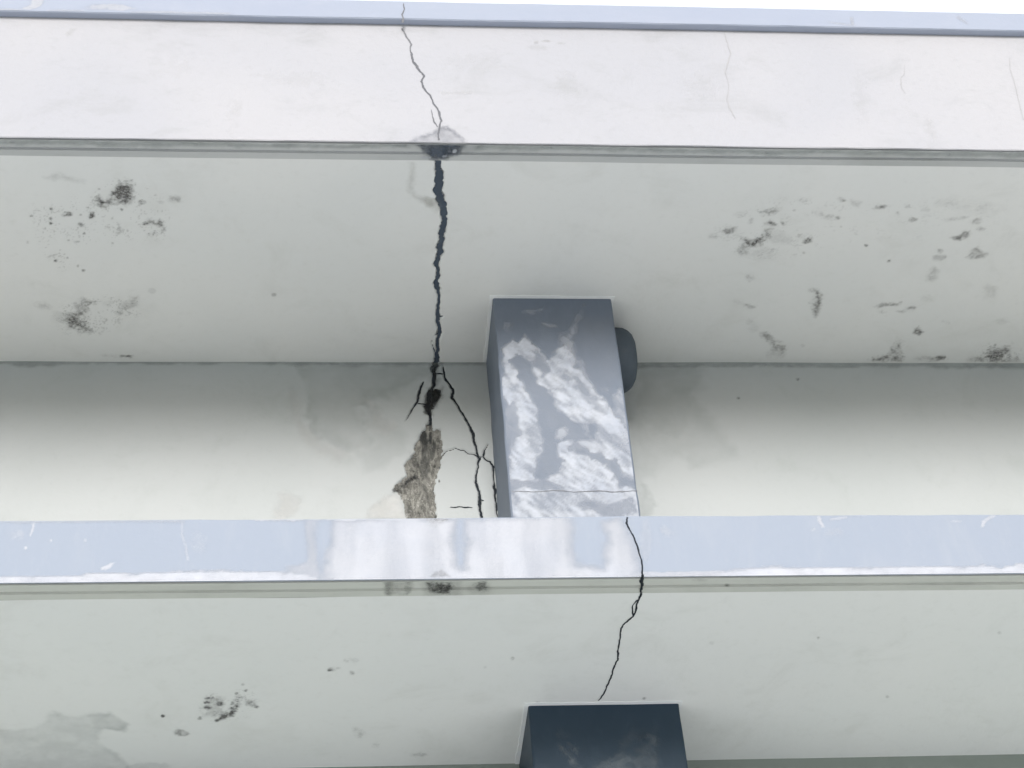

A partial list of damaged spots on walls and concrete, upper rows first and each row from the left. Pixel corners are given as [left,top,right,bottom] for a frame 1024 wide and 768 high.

mould [101,186,131,204]
crack [401,3,629,518]
peeling [0,337,1024,583]
crack [598,517,644,701]